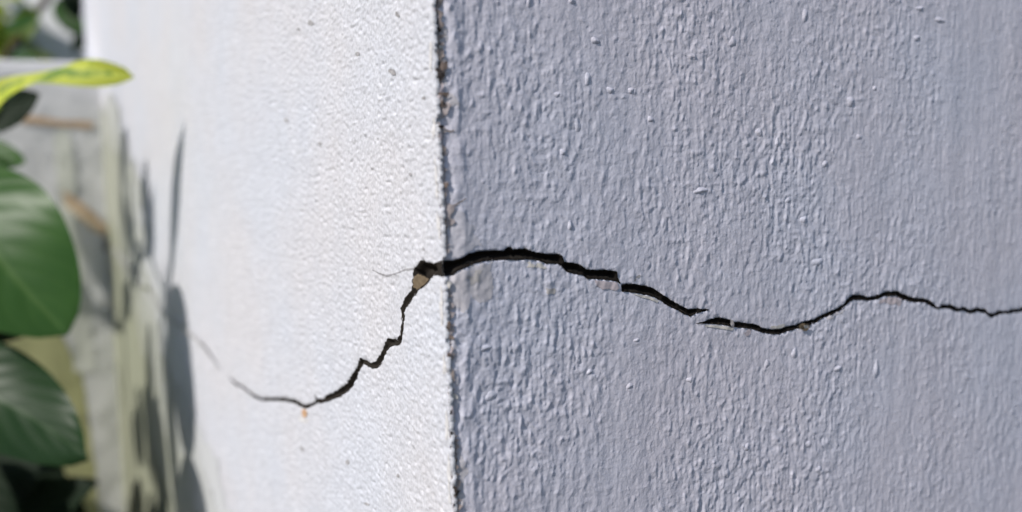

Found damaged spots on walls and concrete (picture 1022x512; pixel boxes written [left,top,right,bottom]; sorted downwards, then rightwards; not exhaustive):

crack [229,247,1022,409]